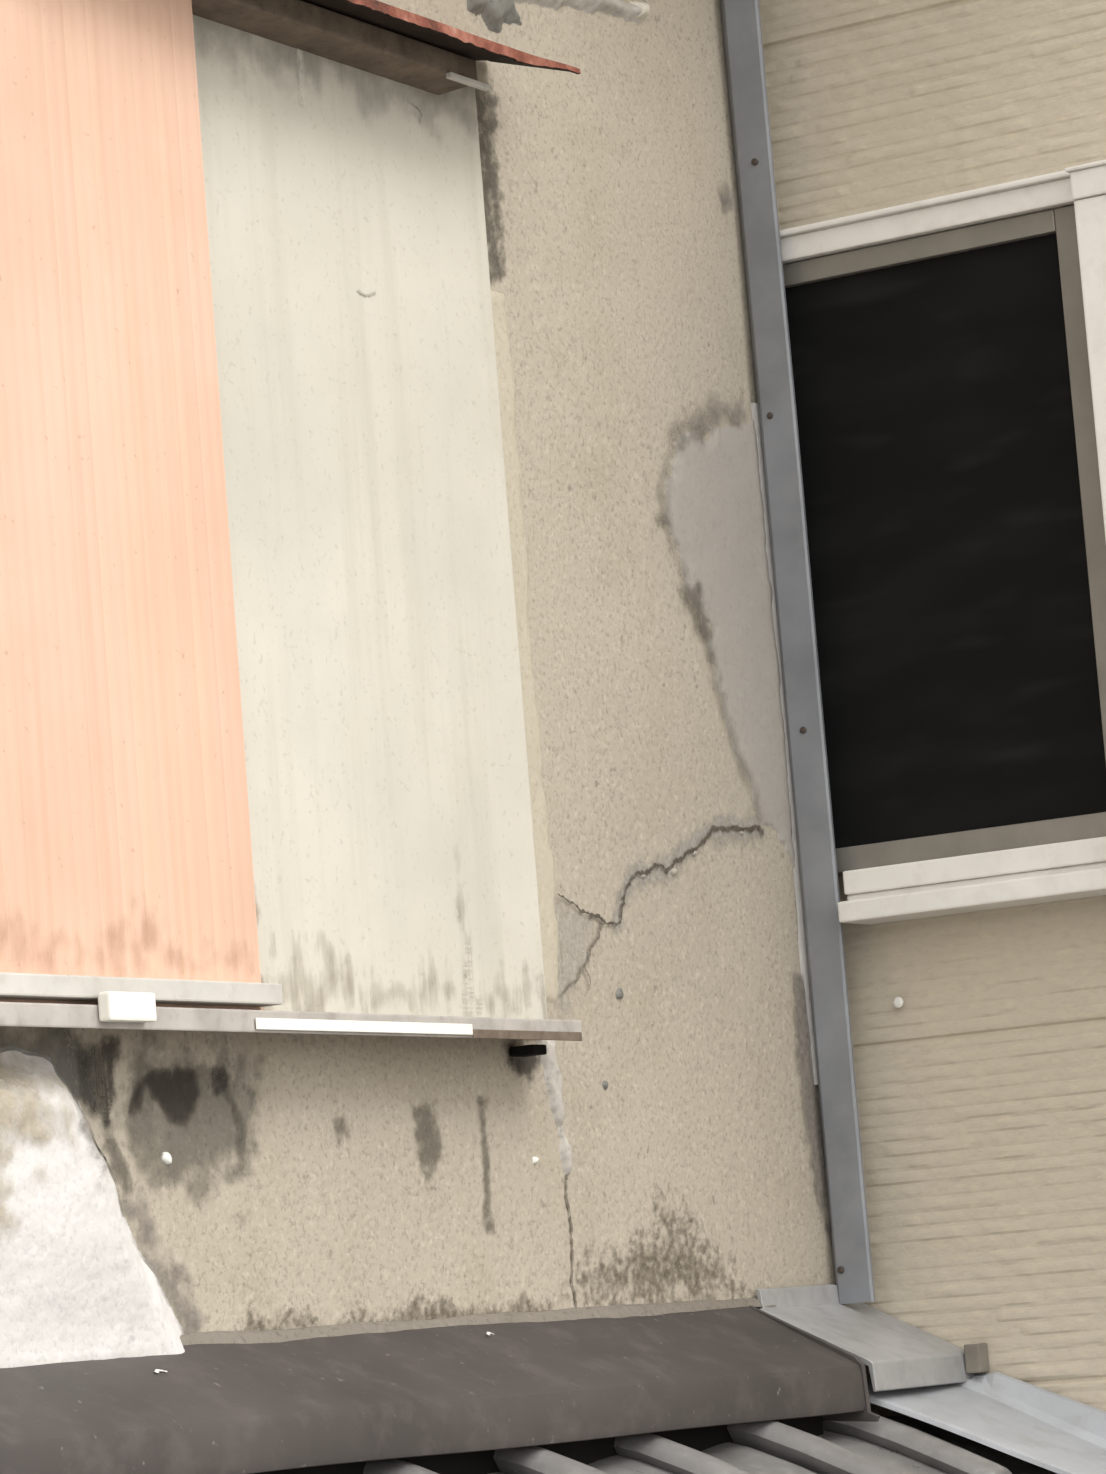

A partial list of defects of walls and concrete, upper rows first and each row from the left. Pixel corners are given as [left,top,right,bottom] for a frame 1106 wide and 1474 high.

crack [555,816,764,1007]
damp [0,1031,129,1189]
damp [130,1068,228,1122]
damp [415,1109,442,1164]
damp [479,1101,492,1229]
crack [566,1174,577,1308]